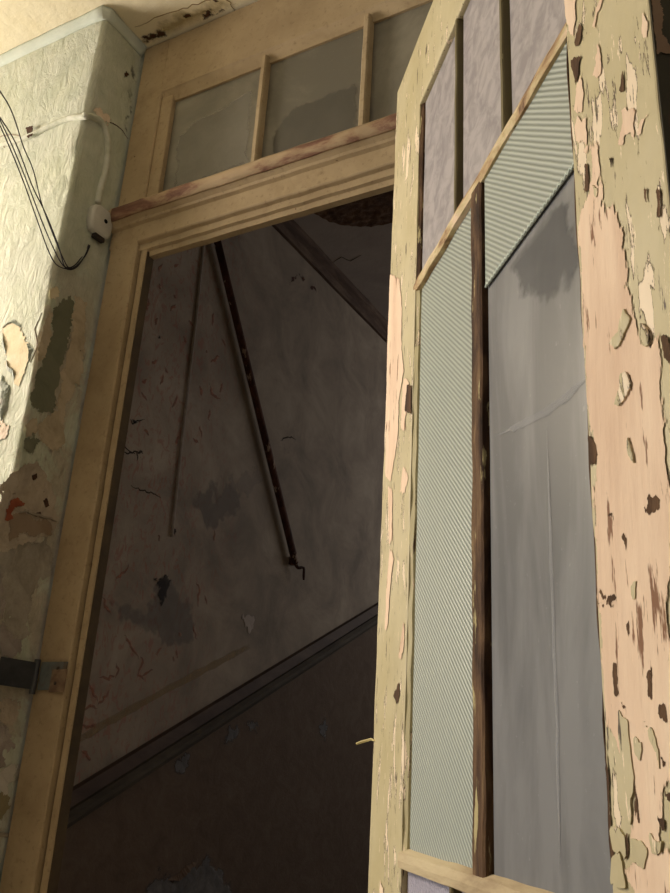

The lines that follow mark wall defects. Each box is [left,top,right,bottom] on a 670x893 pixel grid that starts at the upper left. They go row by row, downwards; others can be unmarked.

spalling [314,190,394,227]
spalling [0,286,88,553]